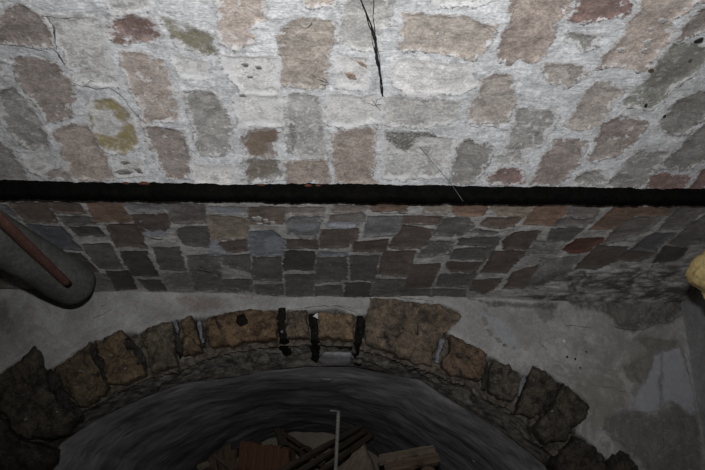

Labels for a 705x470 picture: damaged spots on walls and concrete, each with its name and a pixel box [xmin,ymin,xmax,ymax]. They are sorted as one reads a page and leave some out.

crack [0,14,76,66]